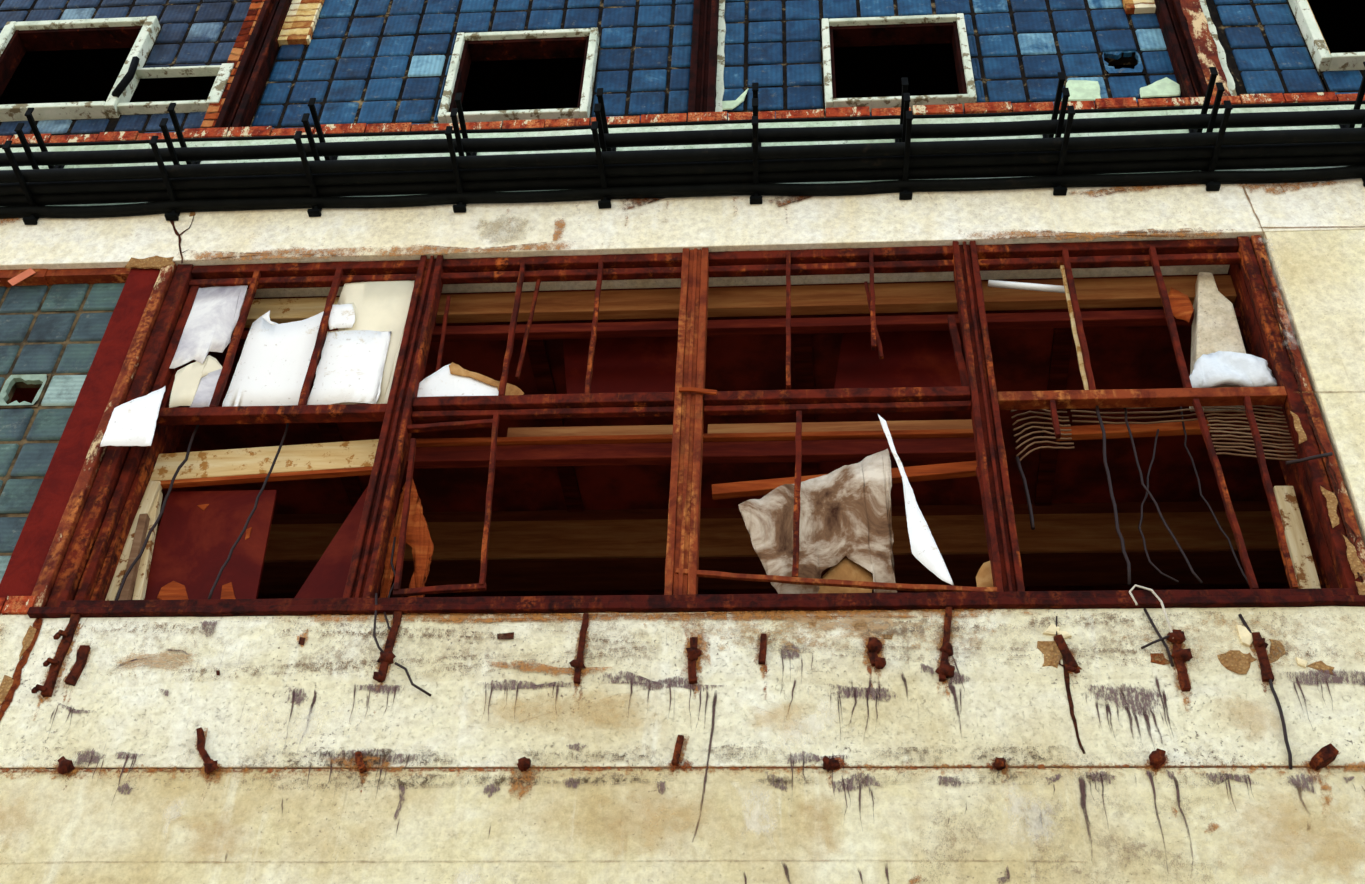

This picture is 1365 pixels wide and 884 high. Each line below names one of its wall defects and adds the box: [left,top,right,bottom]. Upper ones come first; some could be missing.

water stain [482,679,577,718]
rust [297,609,992,710]
water stain [593,671,727,727]
water stain [737,616,994,730]
water stain [1086,677,1170,741]
water stain [1271,619,1365,726]
rust [6,764,120,782]
water stain [75,749,143,797]
rust [659,738,692,772]
water stain [767,674,908,820]
water stain [1079,771,1115,845]
water stain [1111,770,1193,869]